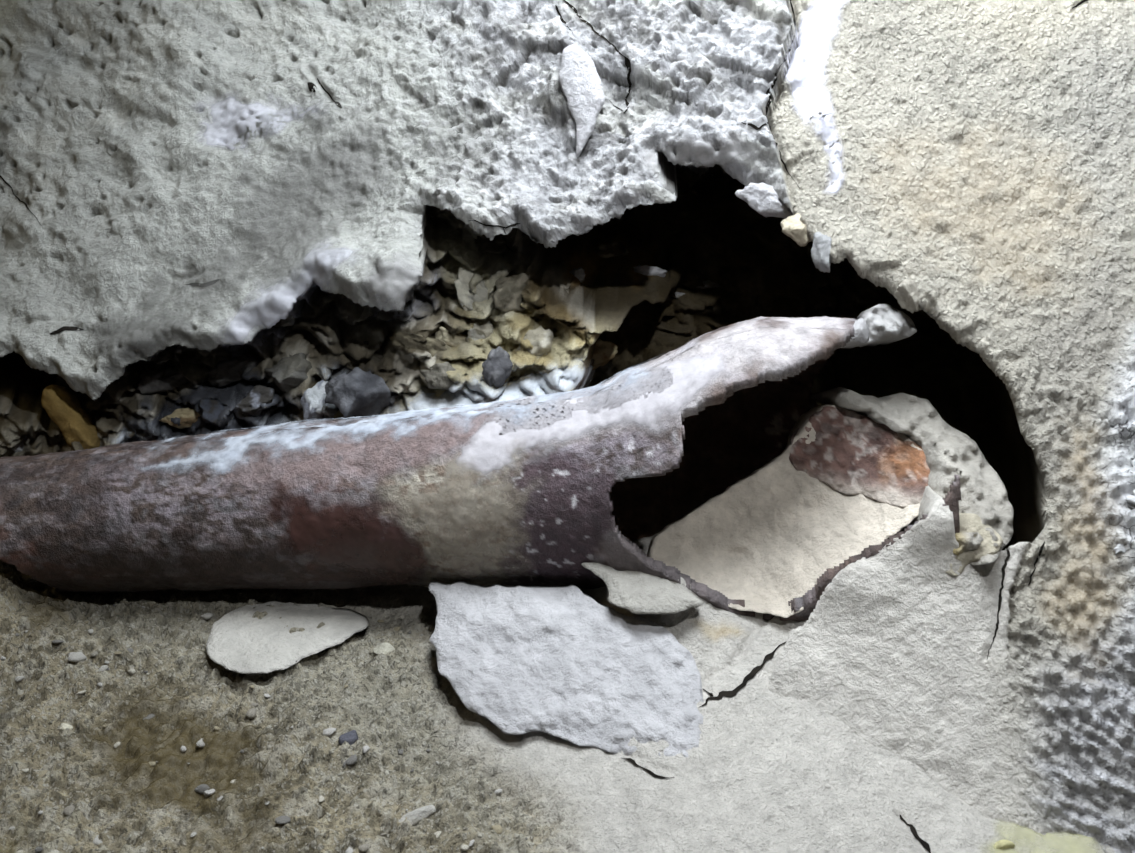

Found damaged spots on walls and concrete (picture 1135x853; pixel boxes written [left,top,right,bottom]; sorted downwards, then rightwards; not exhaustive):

water stain [785,0,845,192]
spalling [0,205,516,457]
spalling [842,318,869,348]
rust [271,483,434,585]
peeling [581,562,704,614]